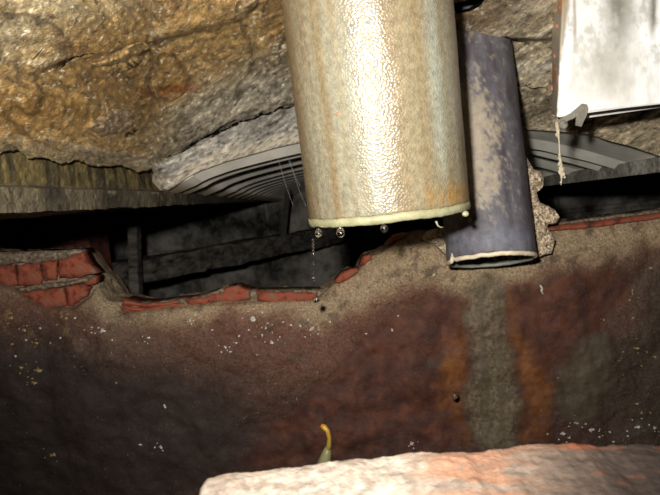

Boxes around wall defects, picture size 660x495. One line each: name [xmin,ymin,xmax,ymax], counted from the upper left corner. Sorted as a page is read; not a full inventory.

spalling [0,247,105,308]
spalling [114,282,328,312]
spalling [334,252,372,284]
rust [249,296,466,468]
water stain [465,278,521,447]
water stain [317,424,331,464]